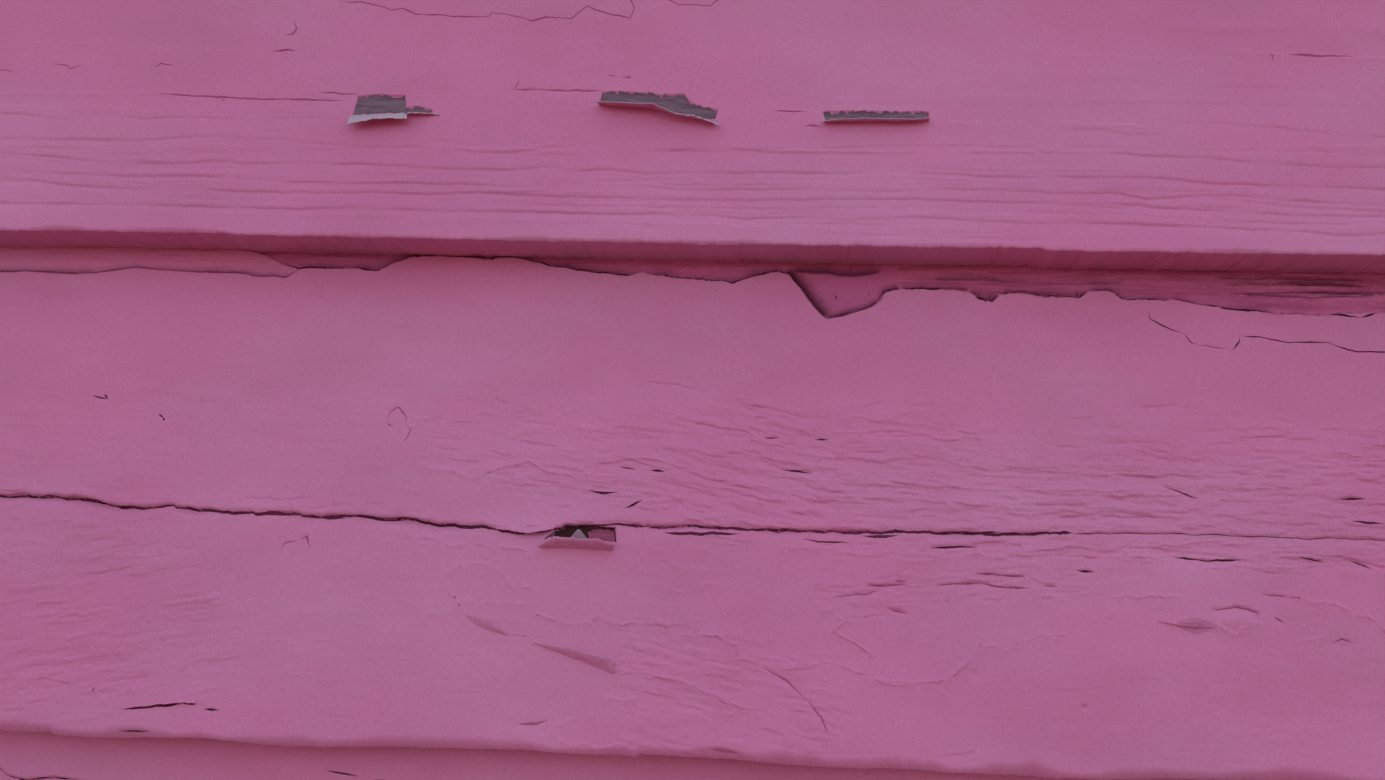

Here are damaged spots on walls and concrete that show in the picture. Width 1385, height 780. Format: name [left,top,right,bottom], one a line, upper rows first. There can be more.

crack [341,0,635,22]
peeling [347,94,439,125]
peeling [596,91,722,127]
peeling [821,110,930,123]
peeling [0,249,433,278]
peeling [453,256,1385,318]
peeling [496,524,616,551]
crack [0,466,1385,614]
crack [1213,594,1291,622]
crack [762,666,828,735]